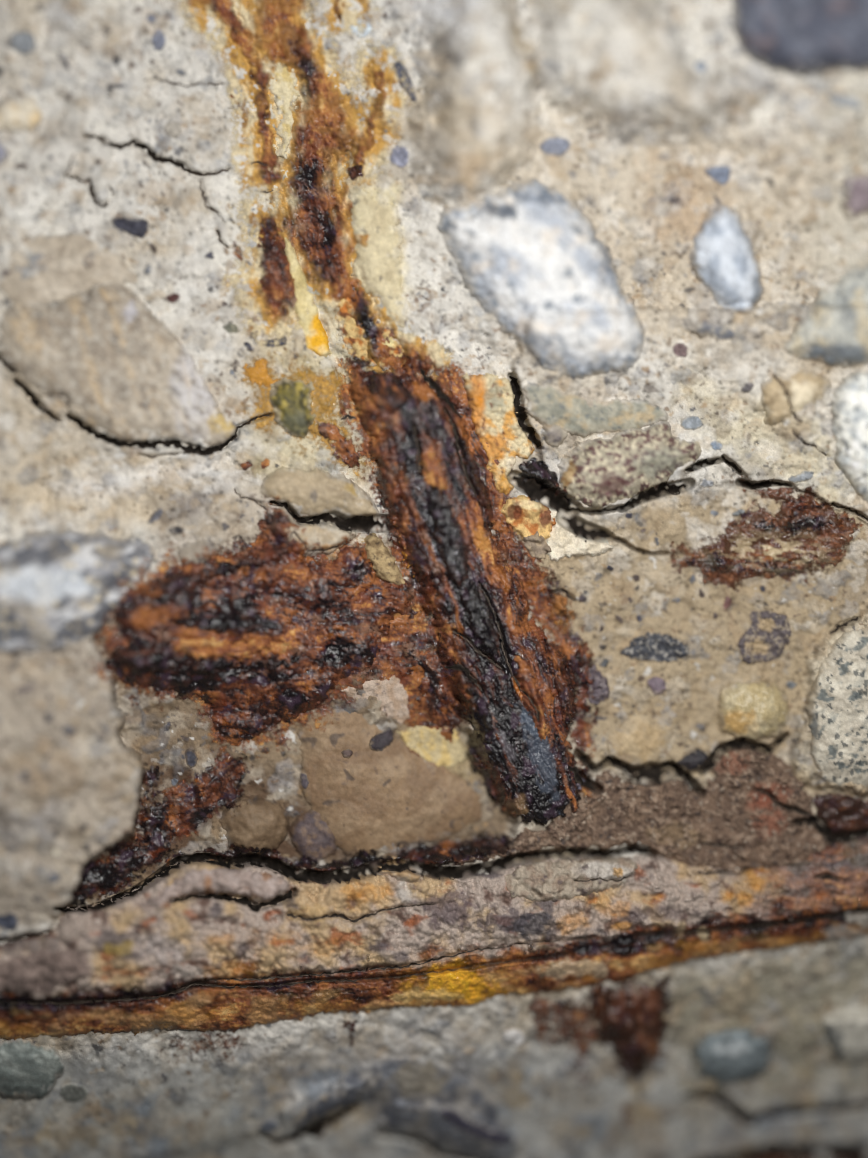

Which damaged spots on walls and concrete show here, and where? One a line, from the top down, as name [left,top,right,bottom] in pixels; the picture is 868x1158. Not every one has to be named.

crack [64,134,273,248]
crack [0,359,270,458]
corrosion [92,0,598,825]
crack [509,376,541,448]
crack [234,488,384,557]
crack [512,456,789,554]
corrosion [670,476,863,591]
spalling [182,735,198,769]
spalling [434,745,832,871]
spalling [0,912,19,931]
corrosion [0,746,868,1084]
spalling [501,1028,526,1047]